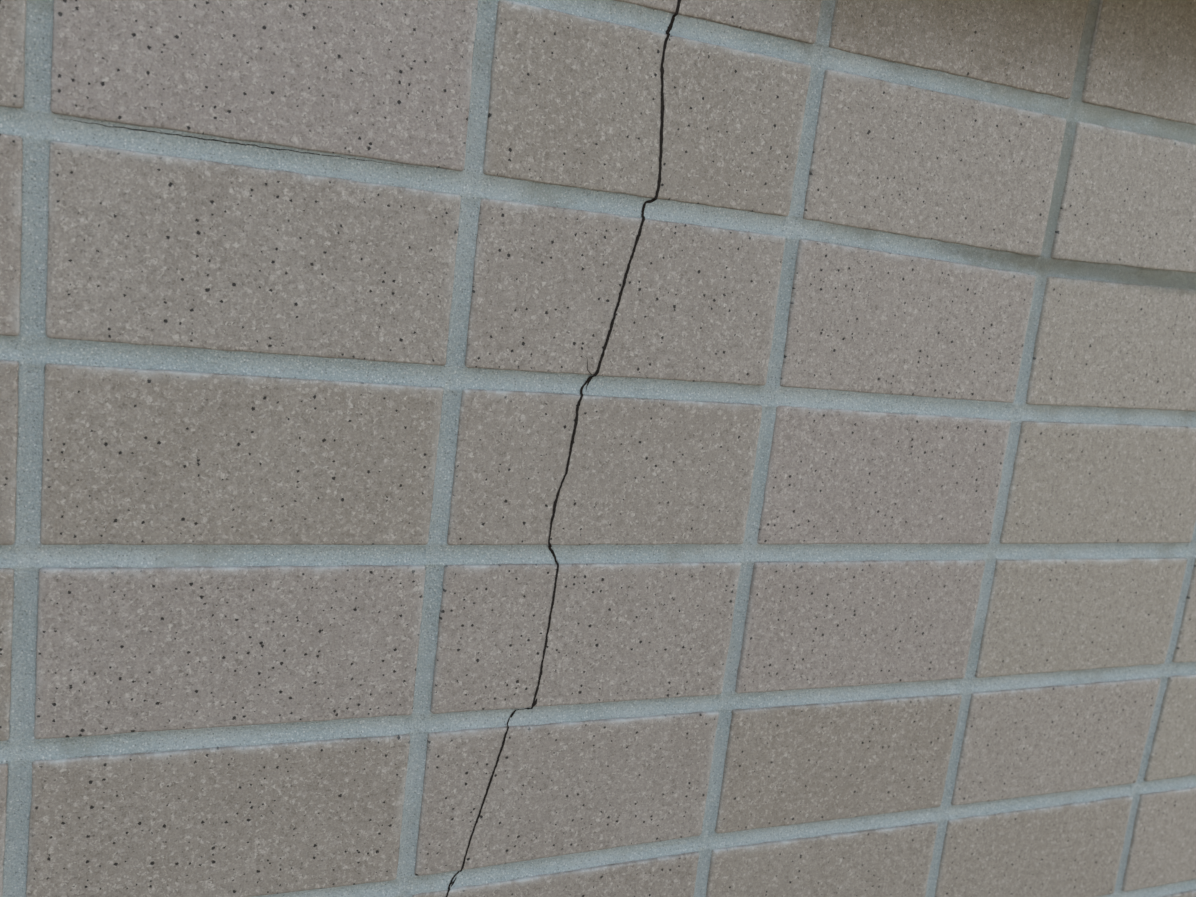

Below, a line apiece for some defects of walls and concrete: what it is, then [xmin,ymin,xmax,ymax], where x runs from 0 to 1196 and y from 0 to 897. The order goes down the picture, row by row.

crack [446,0,681,897]